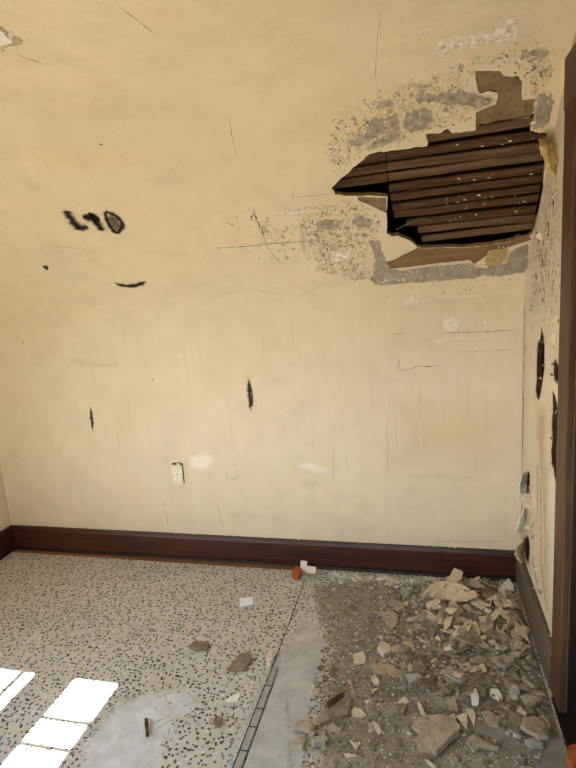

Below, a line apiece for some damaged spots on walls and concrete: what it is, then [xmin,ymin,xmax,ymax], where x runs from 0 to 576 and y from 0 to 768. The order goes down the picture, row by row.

peeling [0,26,22,53]
crack [218,210,334,273]
peeling [223,40,561,350]
peeling [514,469,551,637]